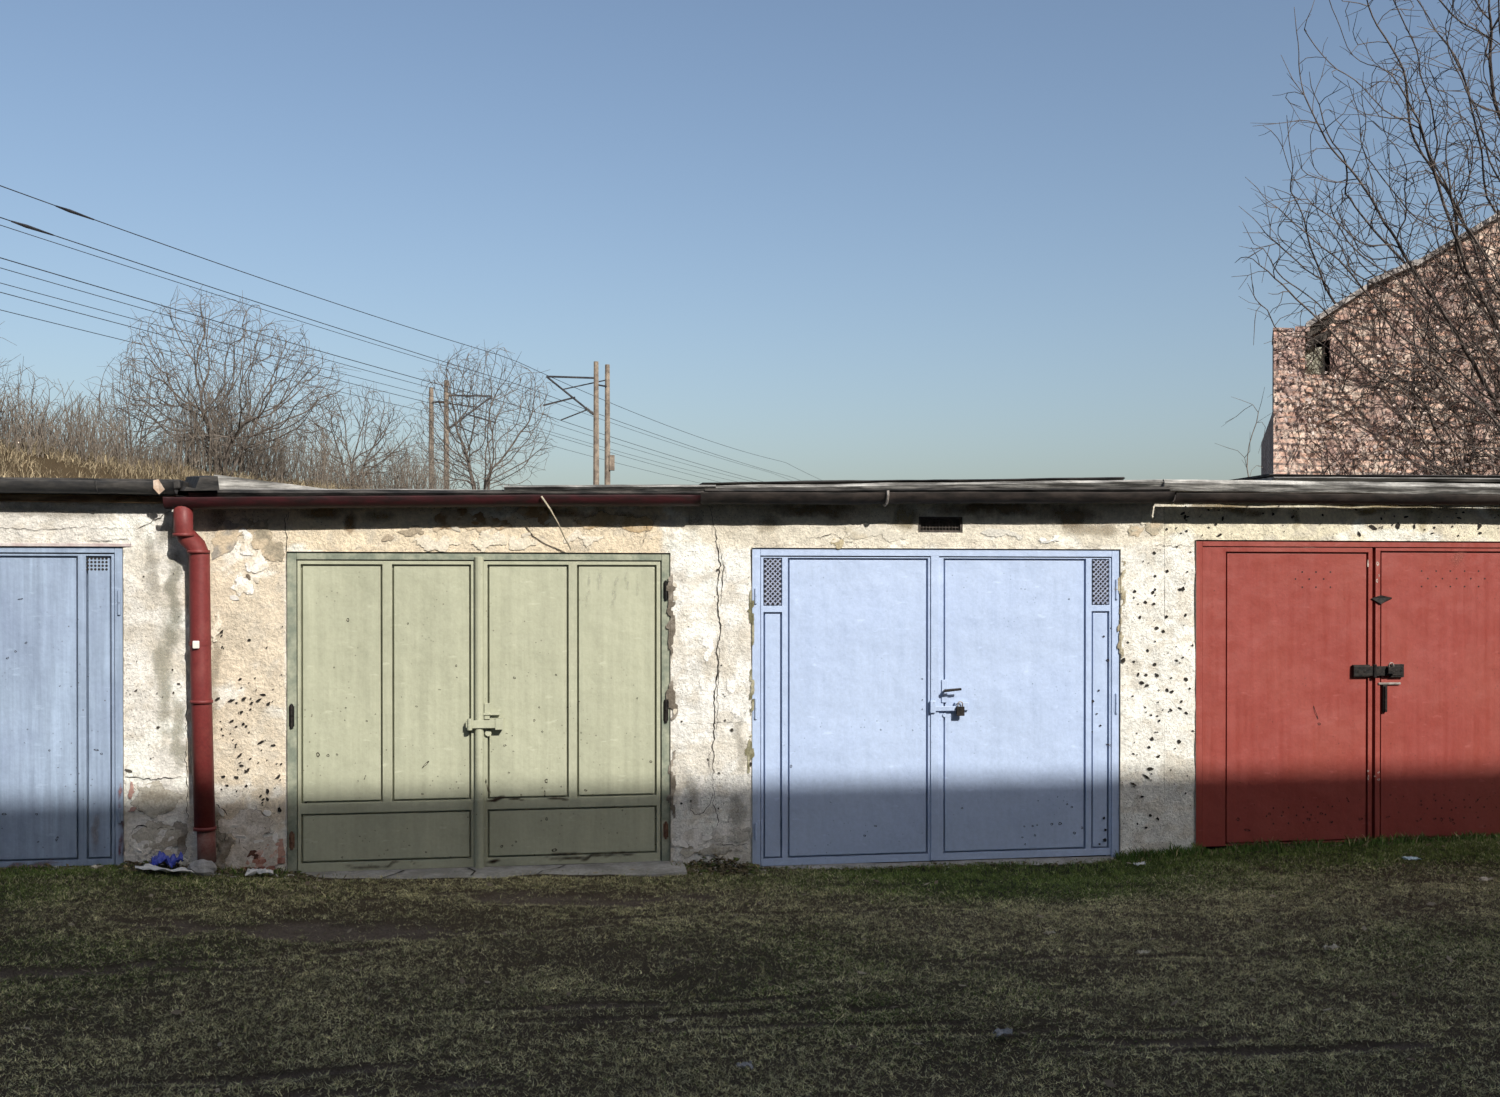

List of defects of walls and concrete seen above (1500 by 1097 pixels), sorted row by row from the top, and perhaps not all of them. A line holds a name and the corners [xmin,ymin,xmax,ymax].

peeling [211,518,285,649]
spalling [215,674,285,871]
crack [690,509,744,846]